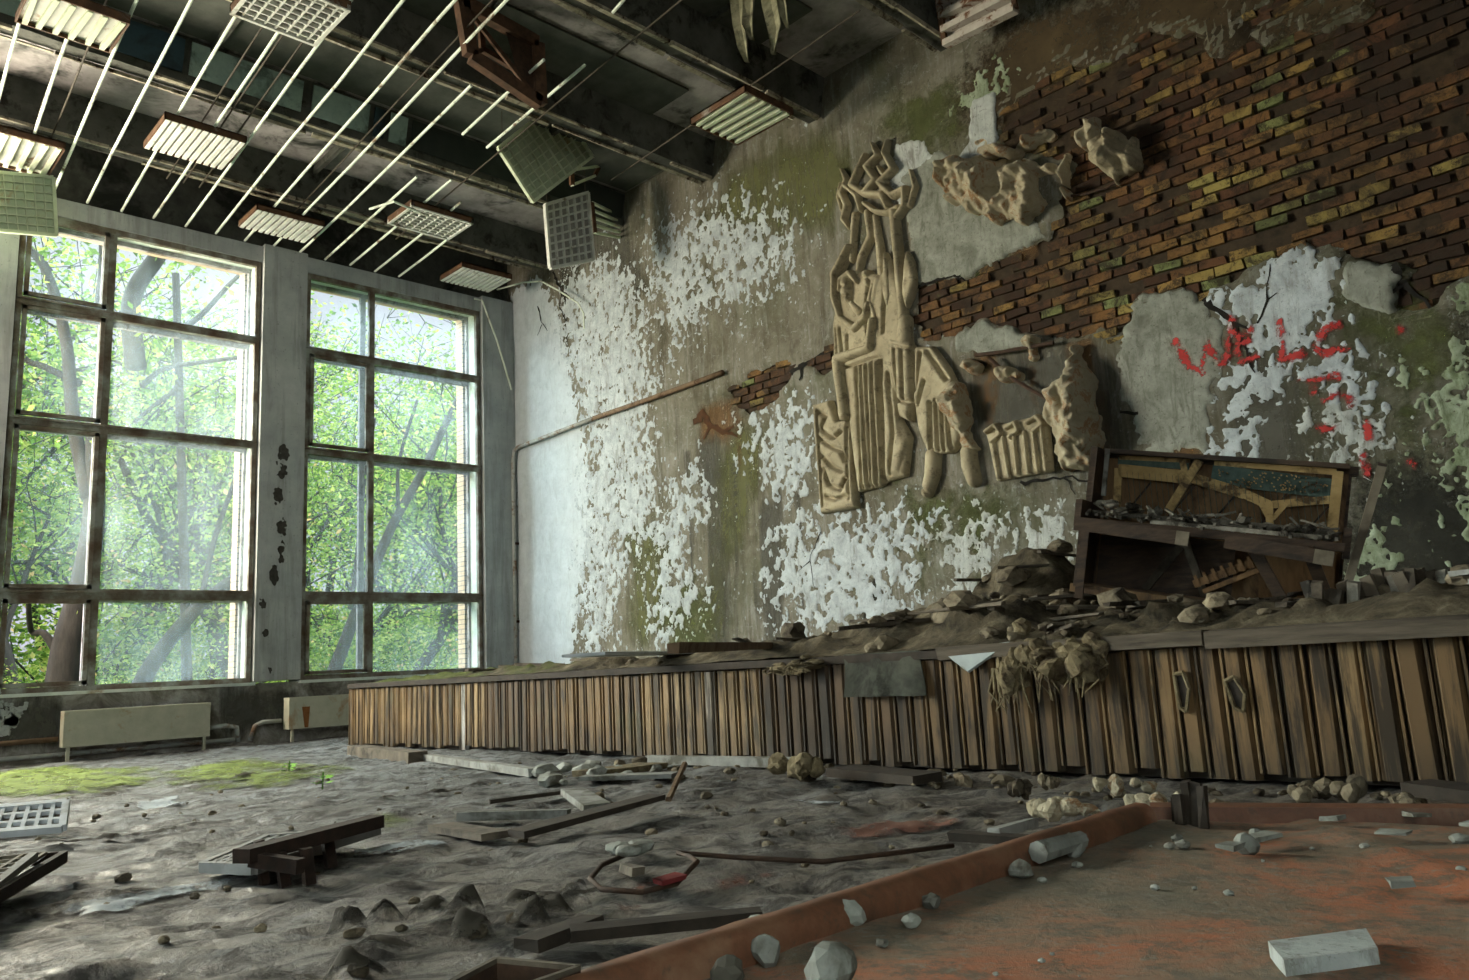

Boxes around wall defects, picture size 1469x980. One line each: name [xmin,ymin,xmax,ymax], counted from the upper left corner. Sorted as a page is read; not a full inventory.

flaking render [890,0,1469,581]
peeling [510,145,1078,664]
peeling [259,444,290,609]
damp [686,438,801,642]
peeling [0,689,29,737]